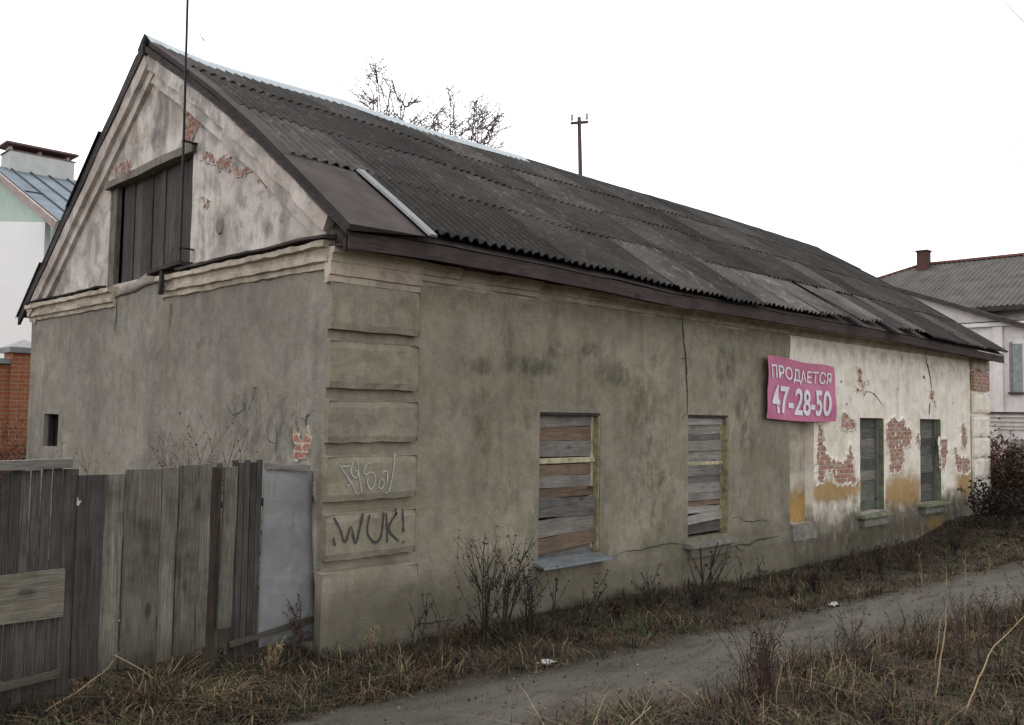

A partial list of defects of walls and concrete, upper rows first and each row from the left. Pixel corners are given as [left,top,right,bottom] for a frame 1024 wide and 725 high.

flaking render [185,111,204,145]
flaking render [200,150,267,188]
crack [680,314,688,418]
flaking render [855,365,870,397]
flaking render [293,425,312,462]
flaking render [813,409,858,489]
flaking render [884,414,921,478]
flaking render [938,420,971,477]
crack [616,539,682,556]
crack [731,517,780,551]